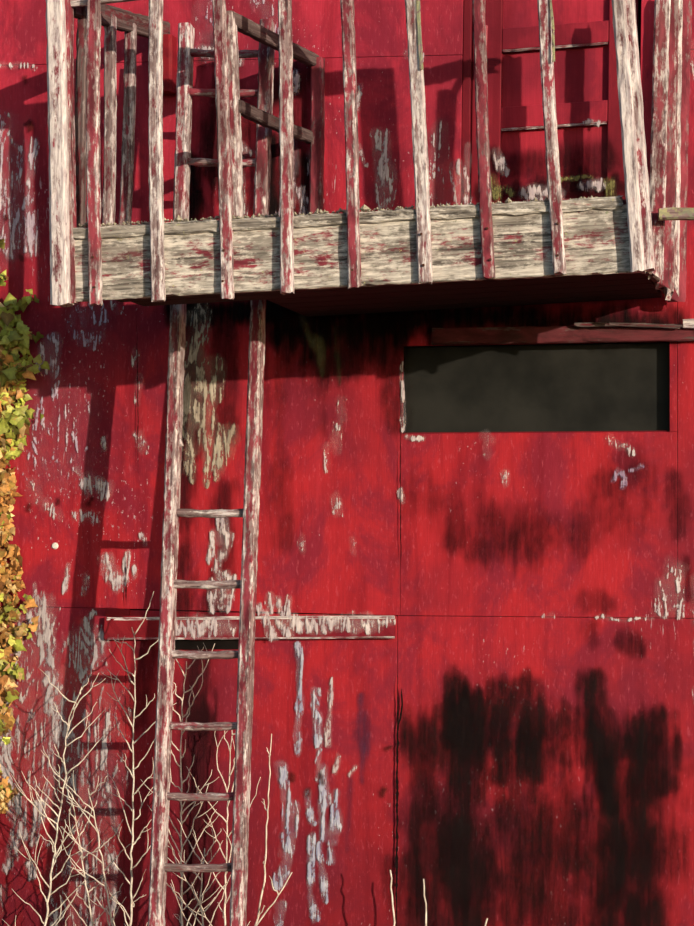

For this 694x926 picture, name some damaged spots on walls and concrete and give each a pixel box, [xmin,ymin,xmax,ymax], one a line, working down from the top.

peeling [0,113,38,259]
peeling [359,129,396,210]
peeling [182,303,235,489]
peeling [101,552,137,592]
peeling [654,565,685,620]
peeling [0,590,133,926]
peeling [256,592,396,922]
water stain [403,669,682,926]